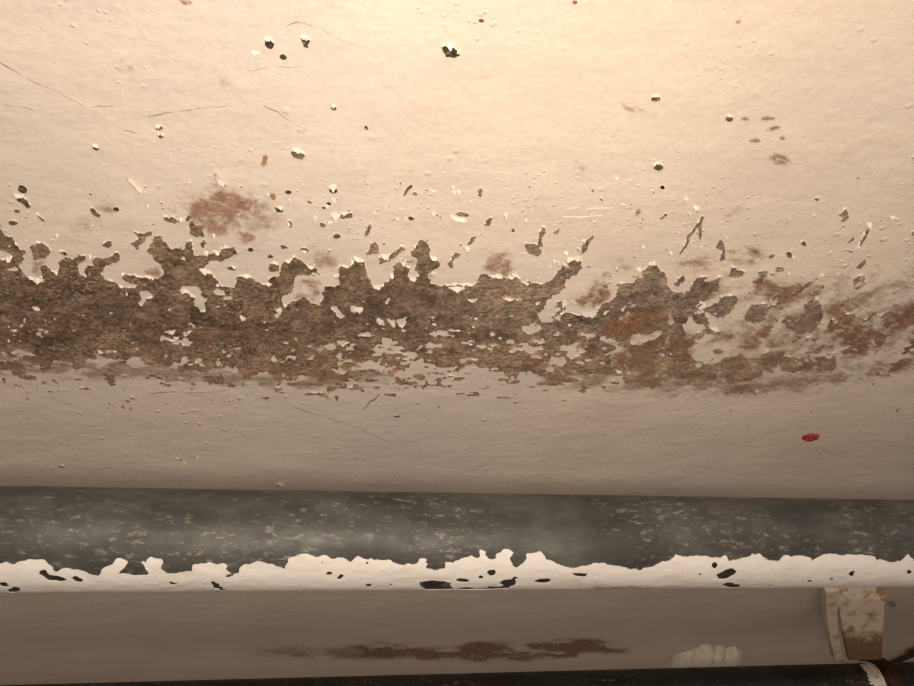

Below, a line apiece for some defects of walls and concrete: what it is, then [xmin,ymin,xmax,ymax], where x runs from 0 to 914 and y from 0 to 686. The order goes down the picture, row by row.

peeling [0,180,914,410]
spalling [39,570,83,582]
spalling [421,570,518,589]
spalling [712,562,740,587]
corrosion [327,639,624,662]